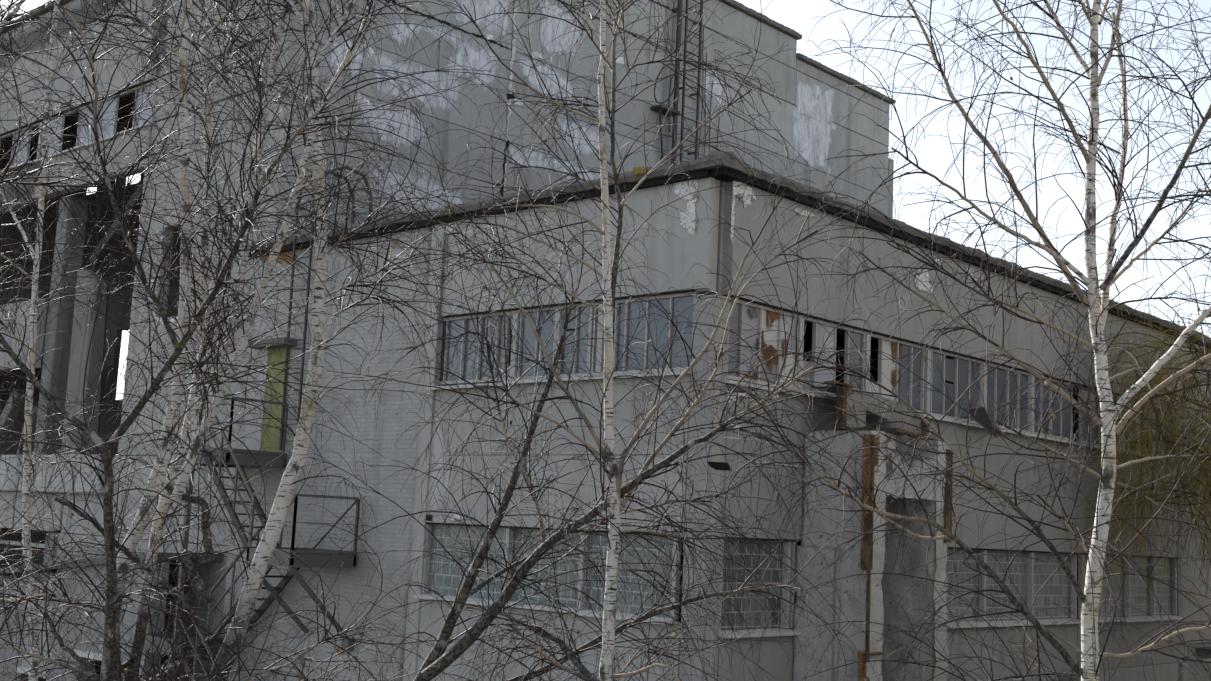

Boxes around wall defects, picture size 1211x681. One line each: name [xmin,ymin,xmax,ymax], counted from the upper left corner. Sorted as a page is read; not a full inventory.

spalling [673,179,699,235]
rust [861,434,880,546]